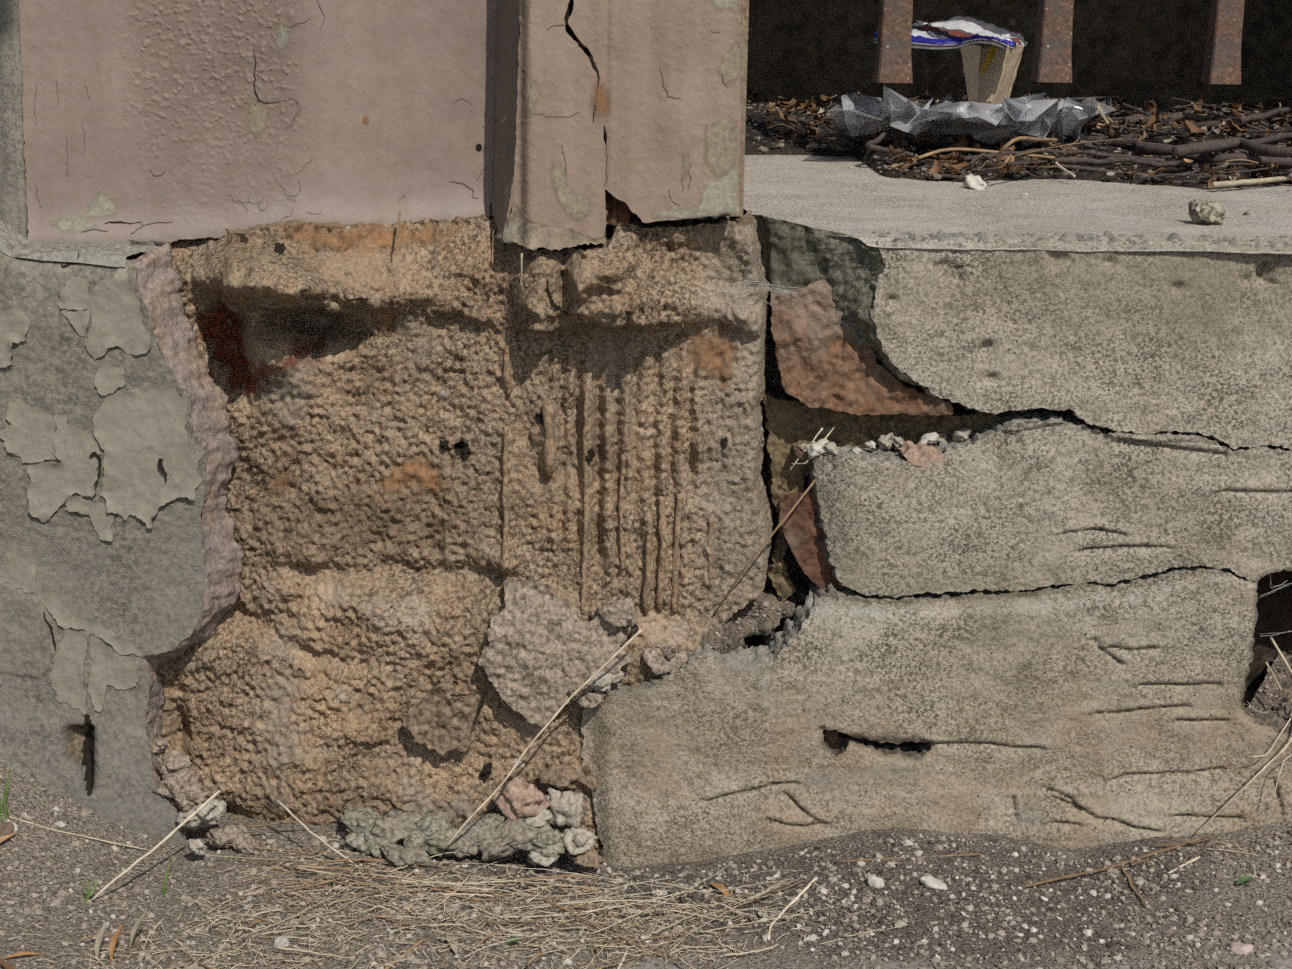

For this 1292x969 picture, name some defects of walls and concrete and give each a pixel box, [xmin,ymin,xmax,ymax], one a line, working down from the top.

crack [534,0,608,187]
spalling [0,168,773,856]
spalling [899,440,945,467]
crack [949,401,1072,416]